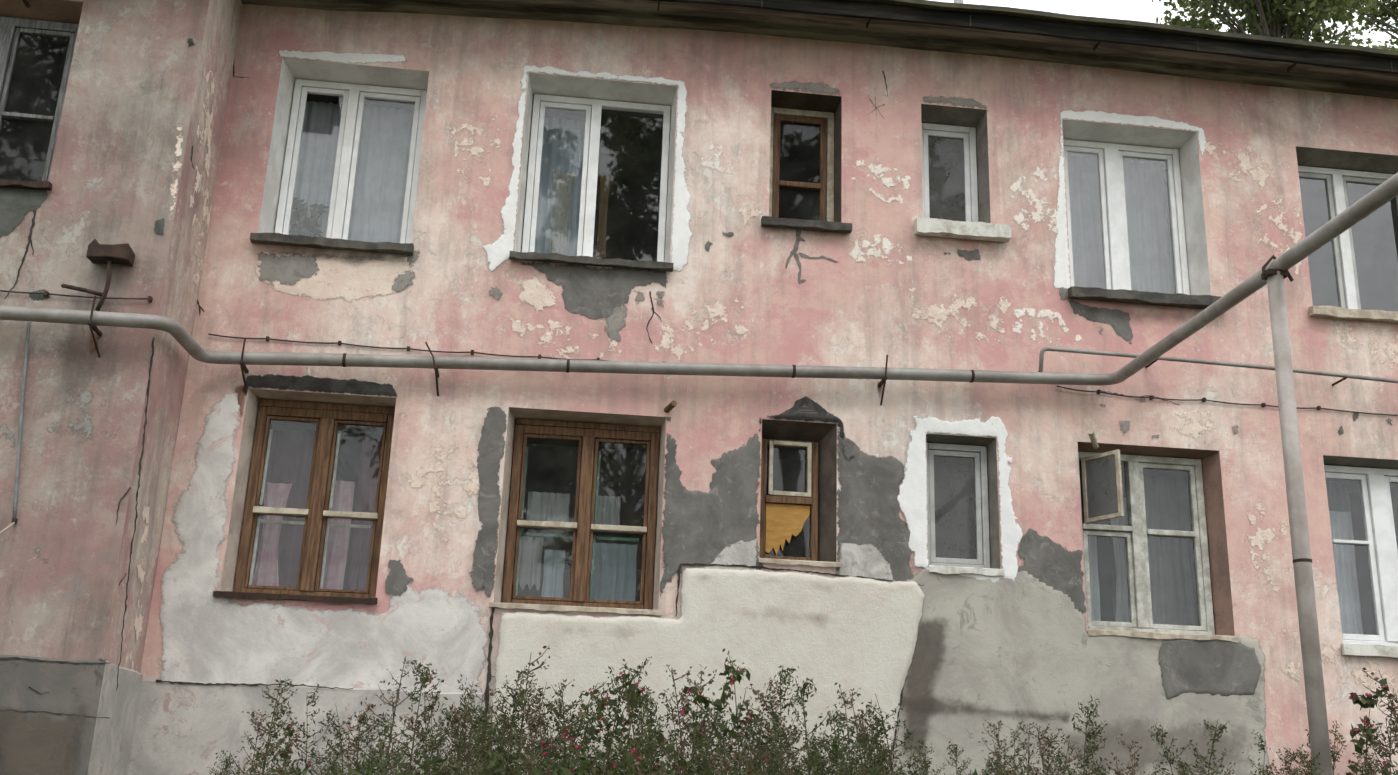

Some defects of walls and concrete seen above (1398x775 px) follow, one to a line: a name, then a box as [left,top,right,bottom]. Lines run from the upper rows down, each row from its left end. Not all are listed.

peeling [0,187,48,237]
peeling [1001,167,1059,244]
peeling [1205,134,1304,275]
crack [4,210,36,299]
peeling [255,250,420,303]
crack [785,230,838,284]
peeling [846,234,912,266]
peeling [489,260,754,361]
crack [646,291,661,344]
spalling [759,396,855,459]
peeling [385,559,413,596]
peeling [470,539,486,591]